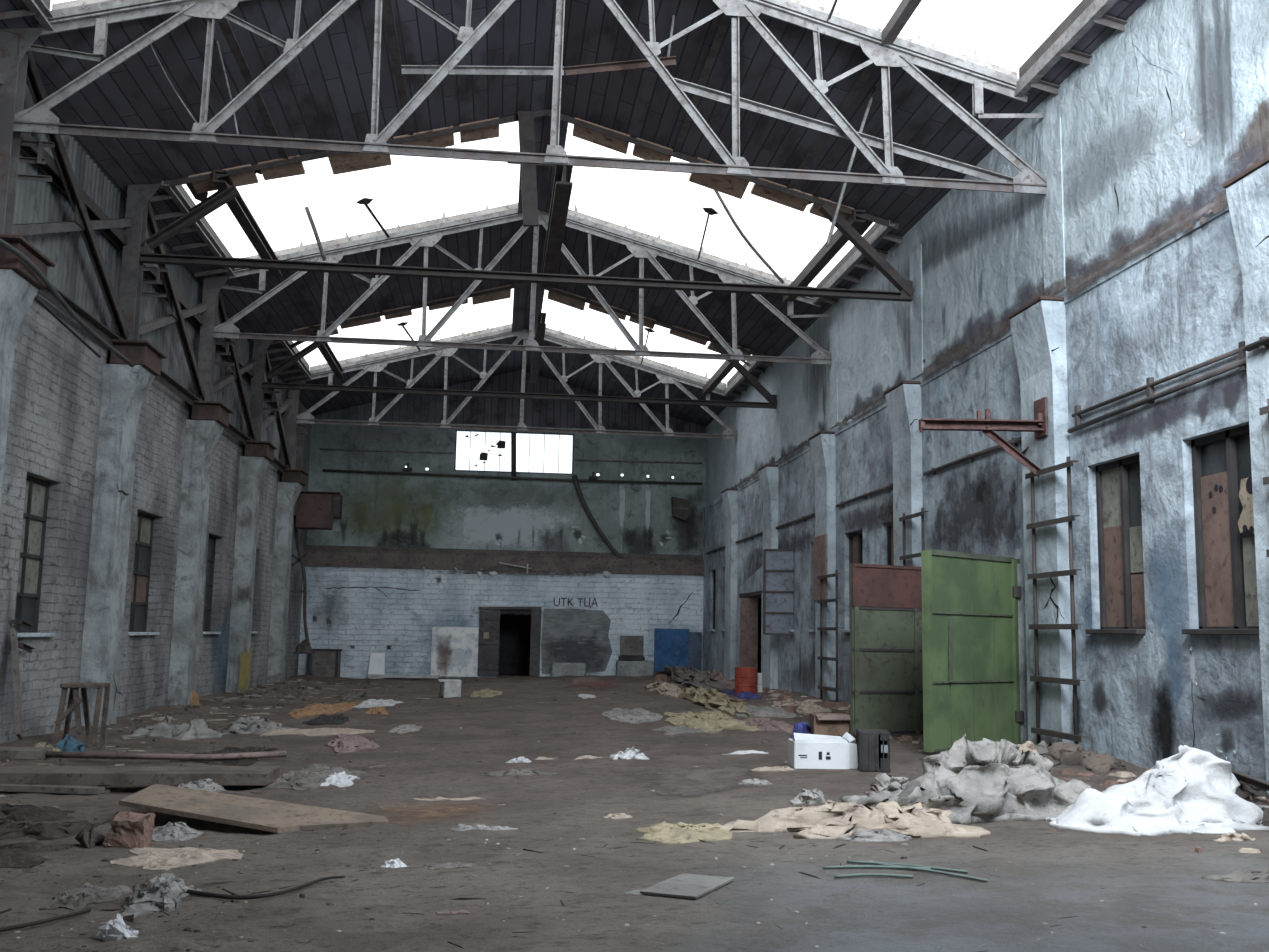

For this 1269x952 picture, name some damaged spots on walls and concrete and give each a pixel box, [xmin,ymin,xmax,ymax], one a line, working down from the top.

damp [905,216,1001,280]
crack [1043,577,1064,622]